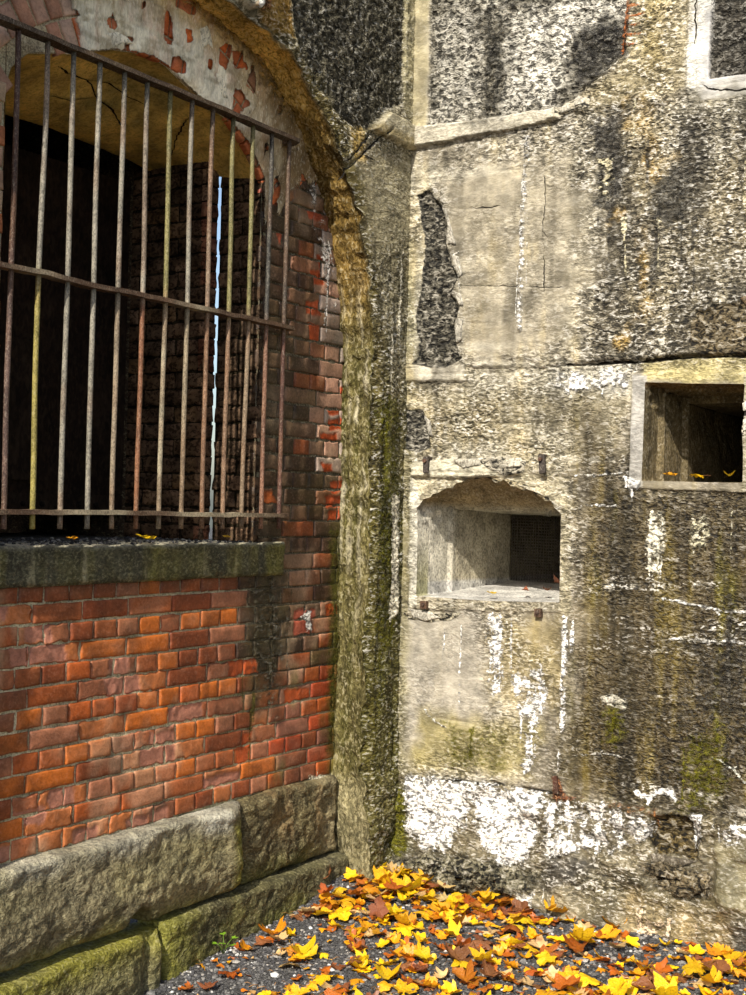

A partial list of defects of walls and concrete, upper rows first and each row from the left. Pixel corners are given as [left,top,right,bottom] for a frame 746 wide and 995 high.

corrosion [622,1,643,54]
crack [691,0,699,44]
crack [53,66,143,125]
crack [171,117,189,155]
flaking render [71,0,328,341]
spalling [554,96,591,120]
crack [698,83,746,93]
flaking render [412,190,463,368]
water stain [388,494,400,623]
efflorescence [485,612,548,775]
efflorescence [559,615,575,733]
efflorescence [402,775,677,866]